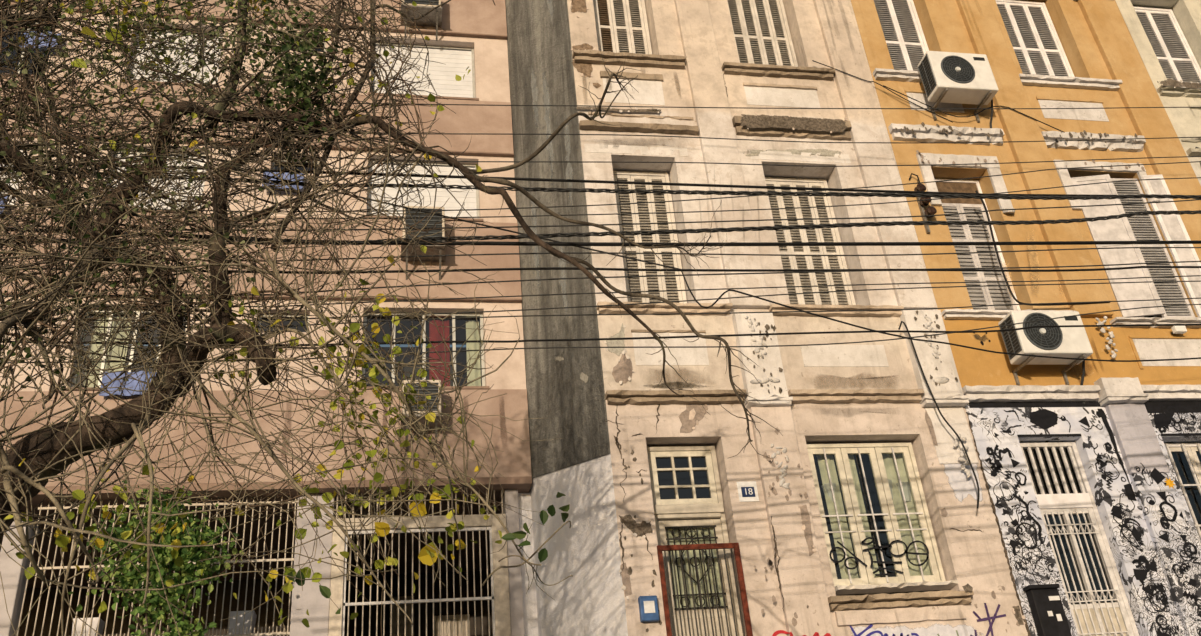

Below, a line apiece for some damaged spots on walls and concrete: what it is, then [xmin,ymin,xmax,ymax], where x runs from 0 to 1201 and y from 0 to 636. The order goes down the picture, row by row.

peeling [571,0,588,18]
flaking render [735,112,849,133]
peeling [747,148,841,157]
flaking render [678,404,708,433]
crack [605,404,660,576]
flaking render [620,514,653,540]
flaking render [619,554,633,600]